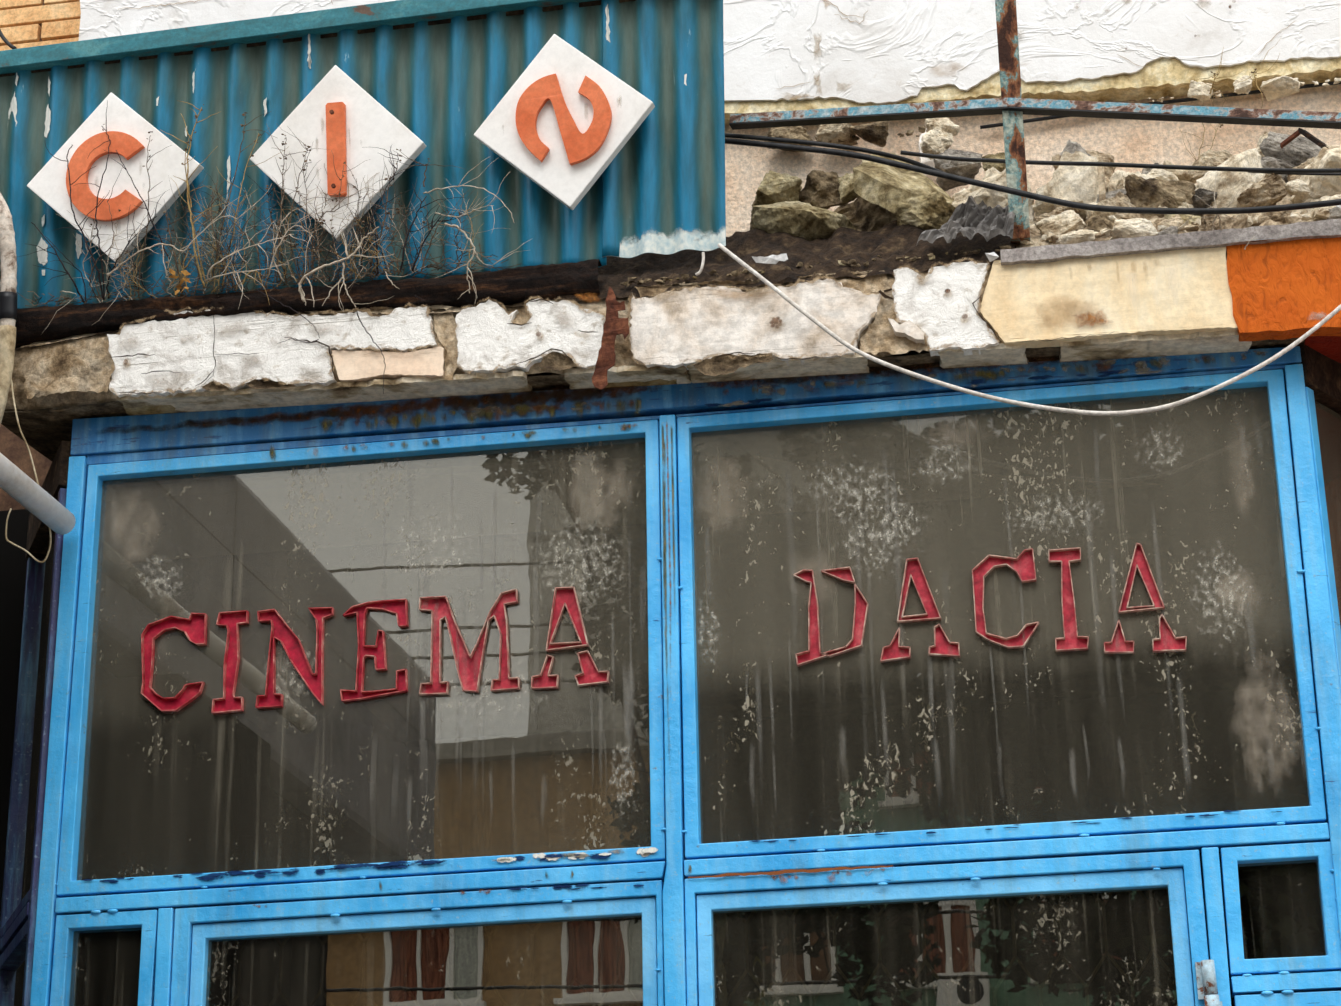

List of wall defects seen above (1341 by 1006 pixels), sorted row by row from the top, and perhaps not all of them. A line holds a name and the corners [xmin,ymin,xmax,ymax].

peeling [604,227,726,258]
rust [105,287,647,447]
peeling [19,247,1252,416]
rust [707,356,1170,395]